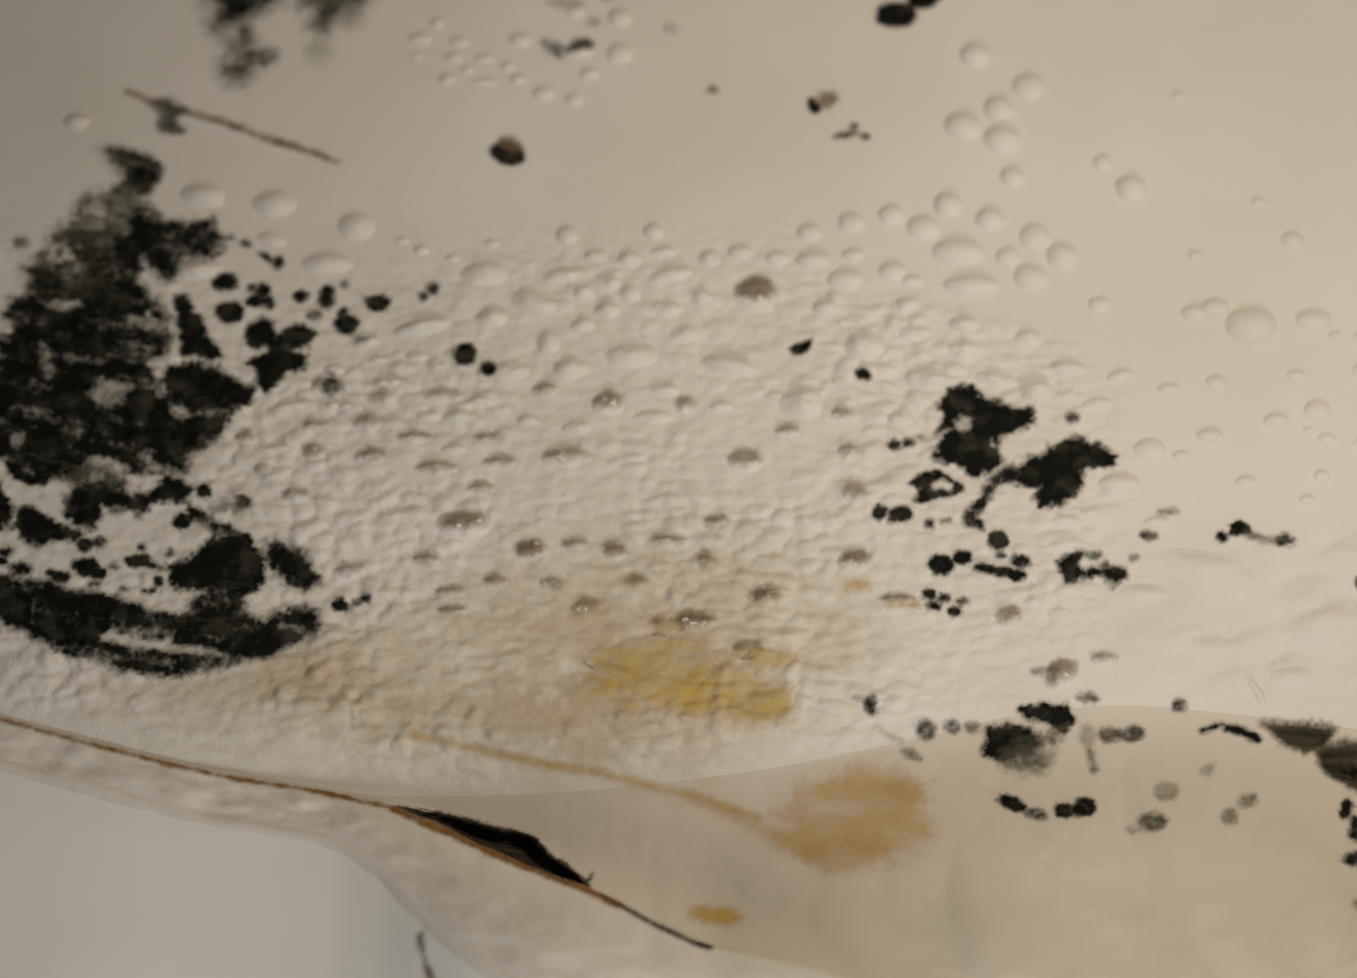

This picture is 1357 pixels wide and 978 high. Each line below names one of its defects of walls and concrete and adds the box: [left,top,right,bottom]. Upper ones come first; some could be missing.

damp [212,0,275,80]
damp [876,0,938,27]
damp [0,147,391,678]
damp [872,383,1128,616]
damp [1140,531,1157,540]
damp [864,696,877,715]
damp [918,695,1098,770]
damp [1090,726,1144,771]
crack [0,718,714,949]
damp [999,795,1097,819]
damp [1139,814,1167,830]
damp [1339,799,1357,865]